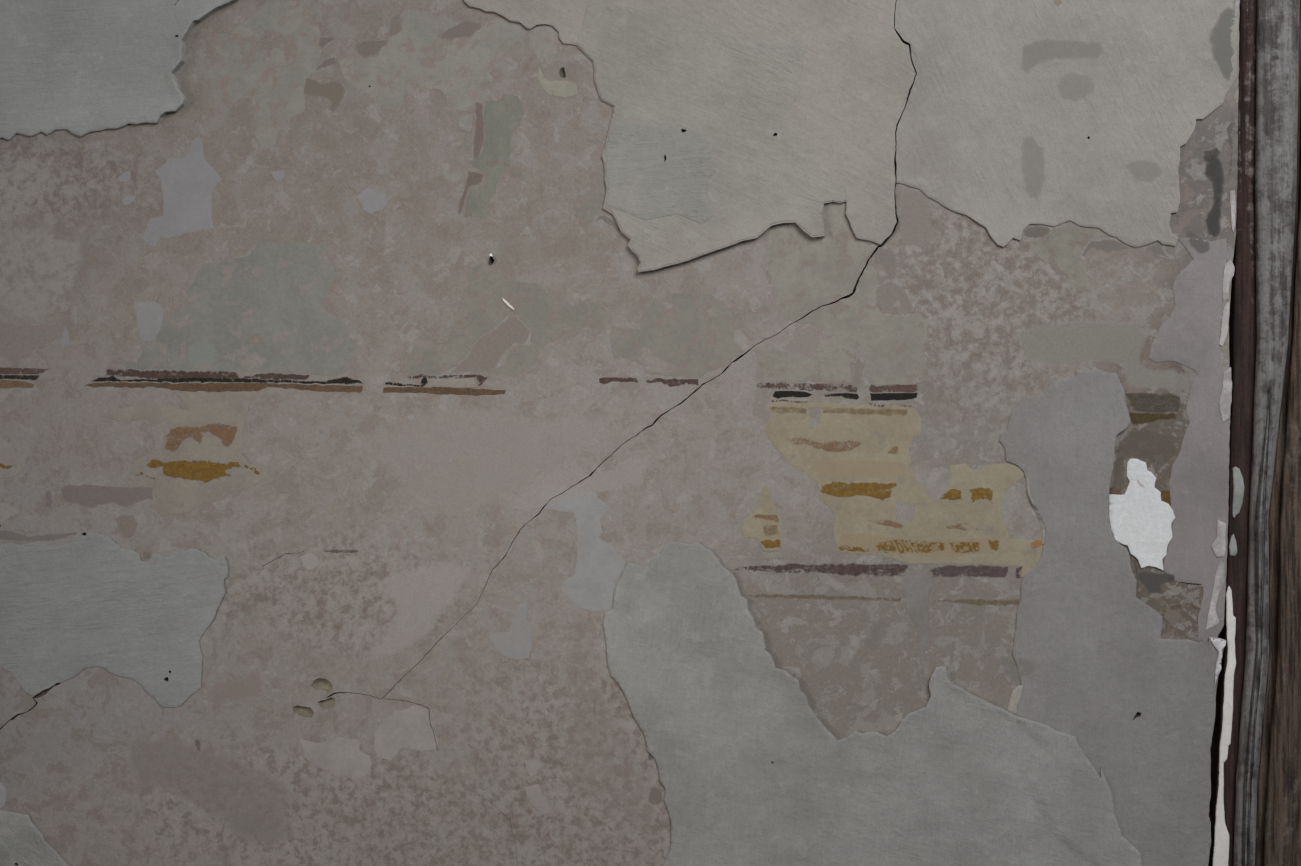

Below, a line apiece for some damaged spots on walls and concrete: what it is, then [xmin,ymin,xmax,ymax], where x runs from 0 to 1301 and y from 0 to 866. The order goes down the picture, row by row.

flaking render [0,0,239,140]
crack [327,0,917,749]
flaking render [439,0,1244,866]
flaking render [45,484,153,538]
crack [0,682,62,729]
flaking render [0,810,69,866]